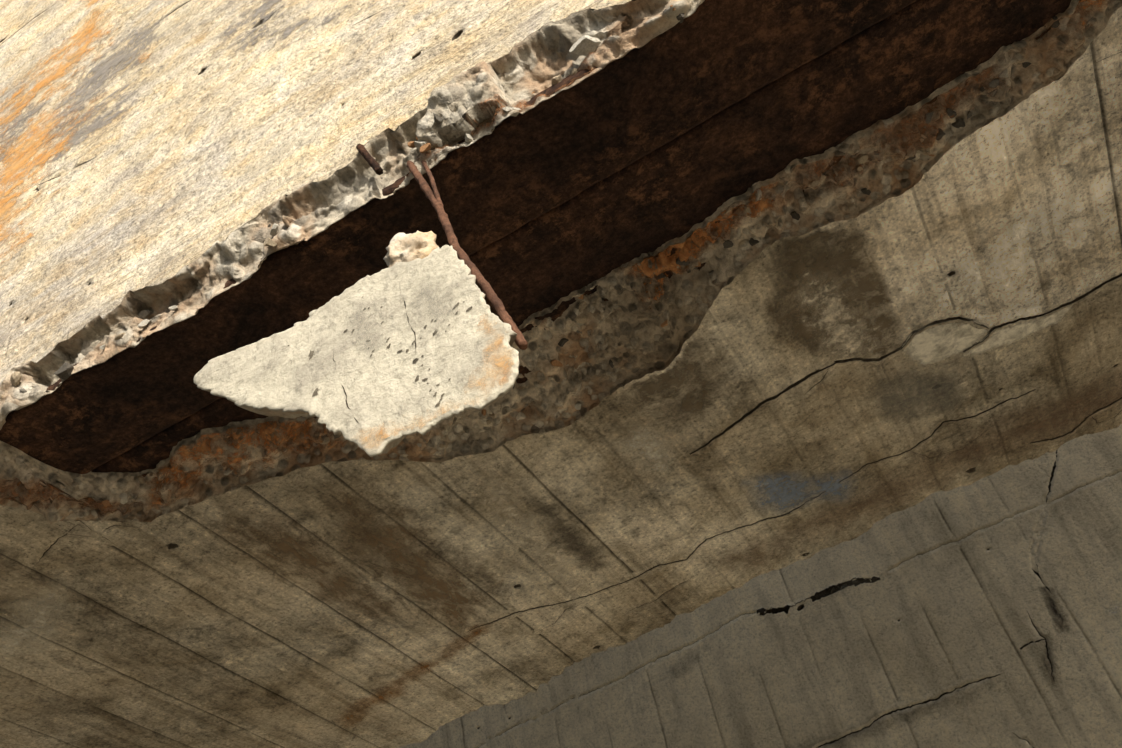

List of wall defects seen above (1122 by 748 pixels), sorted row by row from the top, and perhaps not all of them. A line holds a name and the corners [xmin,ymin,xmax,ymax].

corrosion [0,0,111,256]
corrosion [470,53,593,135]
spalling [0,0,1122,524]
corrosion [632,182,783,301]
water stain [767,231,900,355]
crack [689,268,1122,455]
crack [467,387,1036,632]
crack [1020,394,1122,682]
crack [471,573,880,748]
crack [810,670,1000,748]